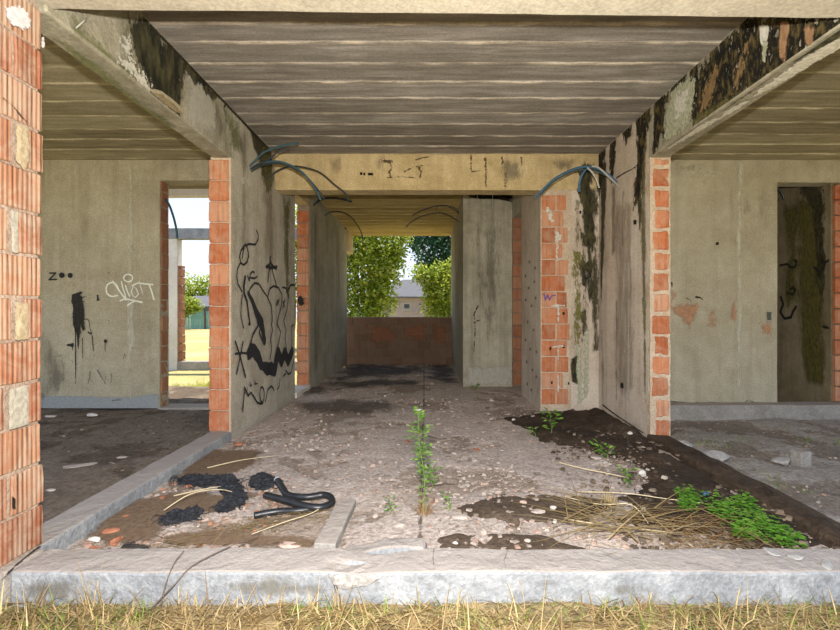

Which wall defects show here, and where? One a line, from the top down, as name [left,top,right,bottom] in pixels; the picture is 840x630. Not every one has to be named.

damp [126,16,217,131]
flaking render [652,159,699,436]
damp [577,17,840,351]
peeling [667,30,840,149]